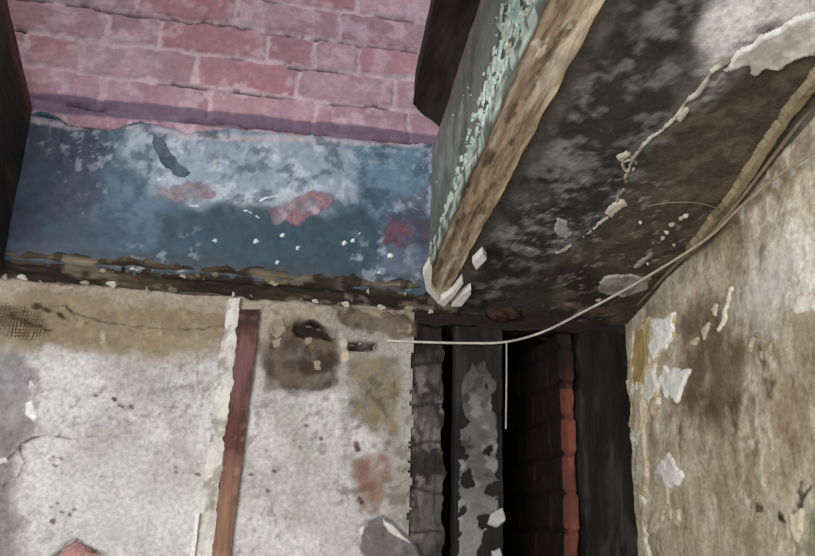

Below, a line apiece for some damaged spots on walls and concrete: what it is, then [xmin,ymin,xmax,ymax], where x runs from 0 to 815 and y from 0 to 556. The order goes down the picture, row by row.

peeling [260,190,333,237]
peeling [626,312,692,556]
spalling [48,541,107,556]